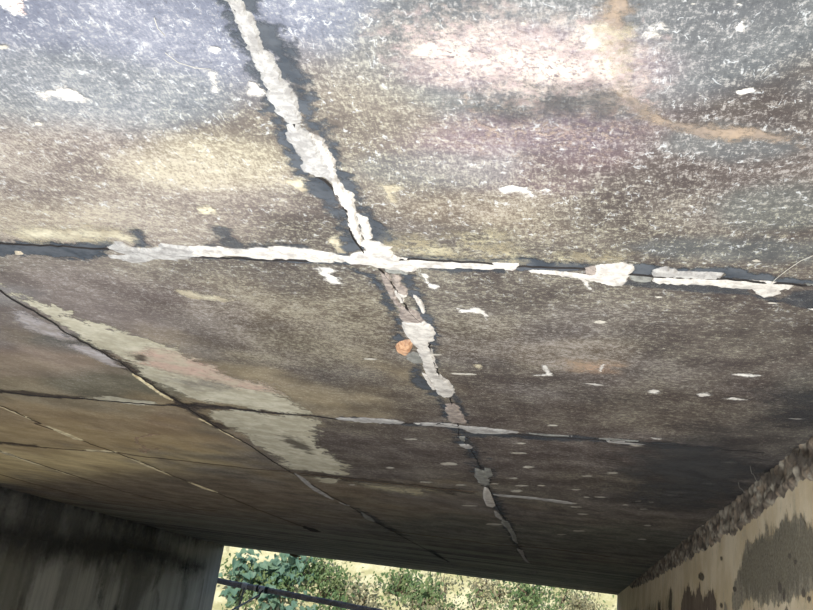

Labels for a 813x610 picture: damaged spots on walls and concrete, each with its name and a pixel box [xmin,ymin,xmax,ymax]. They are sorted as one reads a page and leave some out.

crack [0,0,813,427]
leakage [0,486,204,572]
peeling [0,283,353,483]
crack [0,290,764,564]
peeling [361,483,437,496]
spalling [629,436,813,589]
peeling [681,513,813,610]